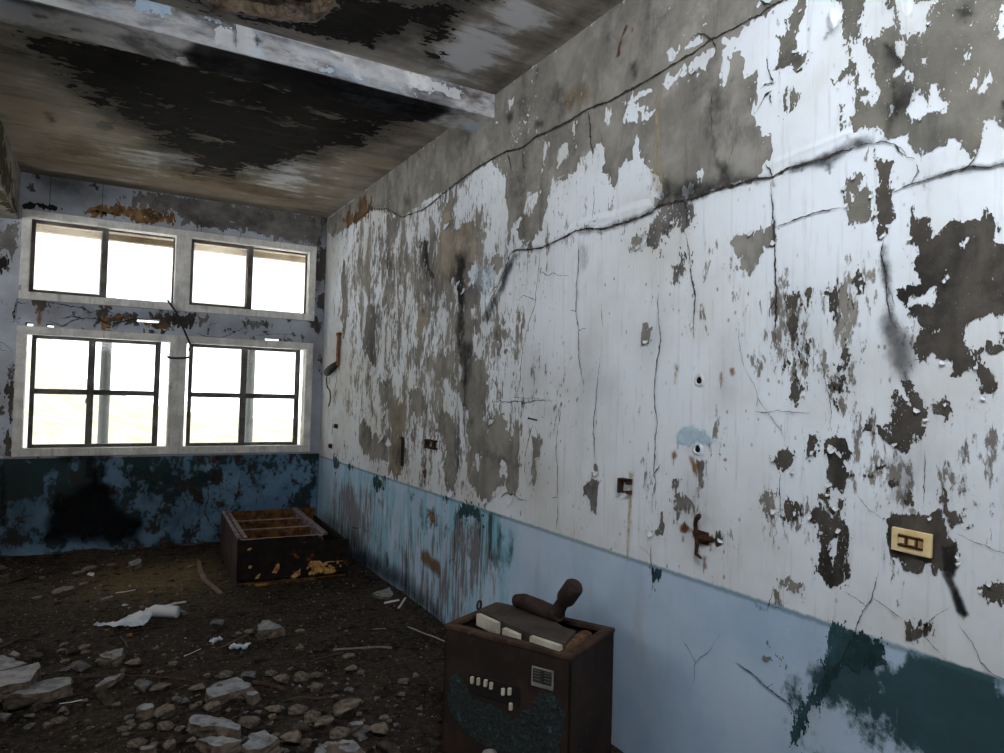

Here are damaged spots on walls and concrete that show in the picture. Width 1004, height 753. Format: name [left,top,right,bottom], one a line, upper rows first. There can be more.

crack [343,0,783,230]
peeling [830,0,1004,161]
peeling [83,0,813,515]
damp [456,258,471,385]
peeling [781,269,866,411]
peeling [841,149,896,240]
peeling [896,205,1004,400]
peeling [861,379,953,454]
damp [46,460,143,541]
peeling [759,431,898,589]
peeling [883,488,973,576]
damp [943,545,968,617]